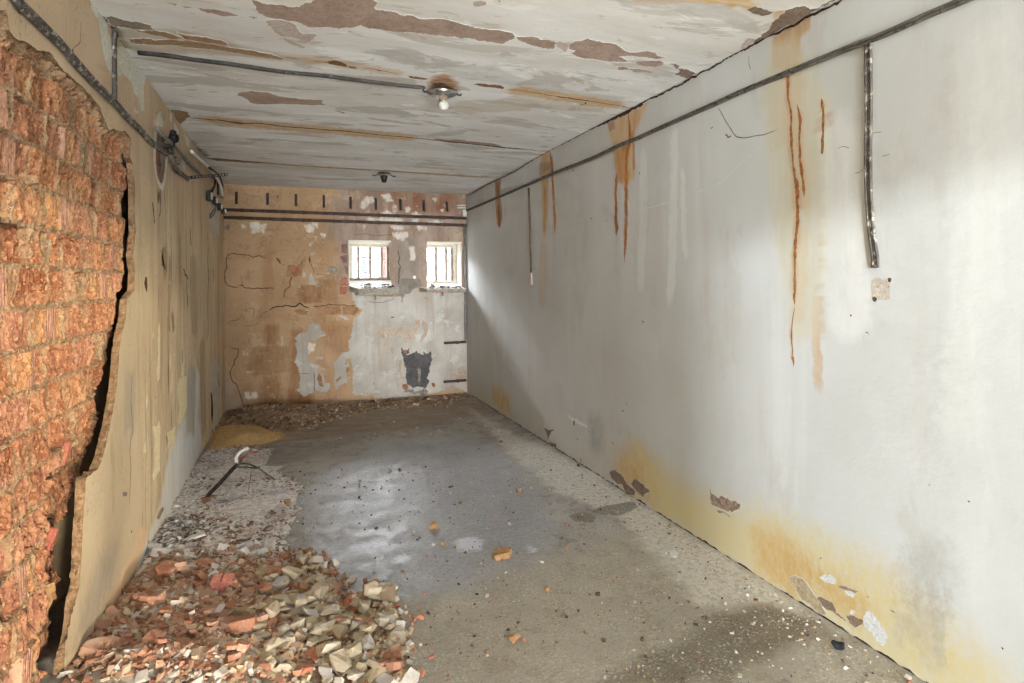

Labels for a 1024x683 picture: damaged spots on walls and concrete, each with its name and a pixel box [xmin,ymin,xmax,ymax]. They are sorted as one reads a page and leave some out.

peeling [170,0,697,78]
spalling [0,10,147,683]
crack [183,232,355,406]
peeling [277,192,467,399]
rust [495,179,507,230]
rust [537,150,557,312]
rust [604,99,652,262]
rust [786,69,805,366]
rust [810,347,827,402]
peeling [710,489,741,517]
water stain [604,420,1024,683]
peeling [790,574,888,646]